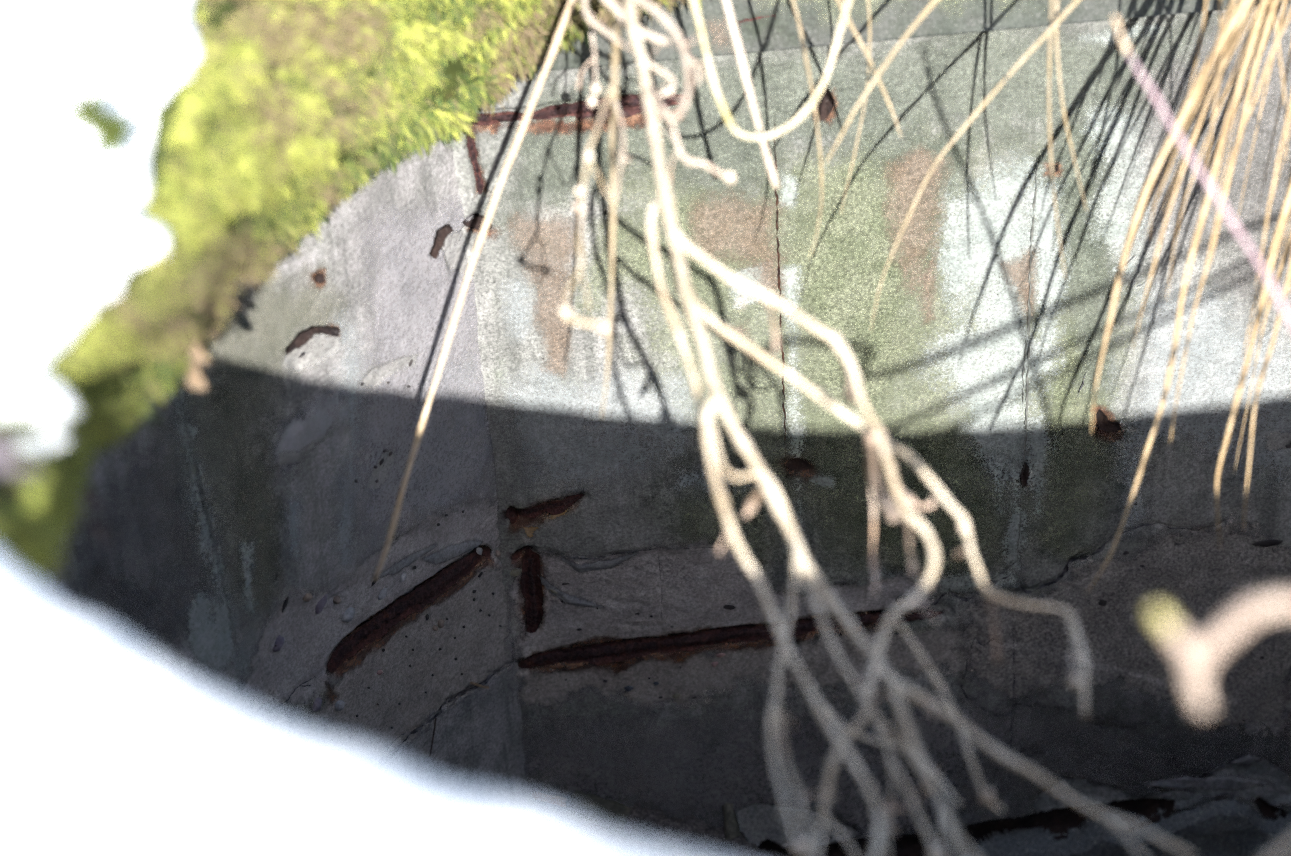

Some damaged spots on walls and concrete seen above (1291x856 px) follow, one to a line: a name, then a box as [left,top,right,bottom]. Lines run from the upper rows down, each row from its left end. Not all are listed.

leakage [1084,25,1158,45]
corrosion [452,93,691,195]
leakage [508,371,693,488]
leakage [850,107,1149,598]
crack [929,162,1224,610]
corrosion [325,545,494,704]
corrosion [503,492,584,640]
corrosion [518,607,943,673]
spalling [242,497,1291,756]
spalling [1033,754,1291,814]